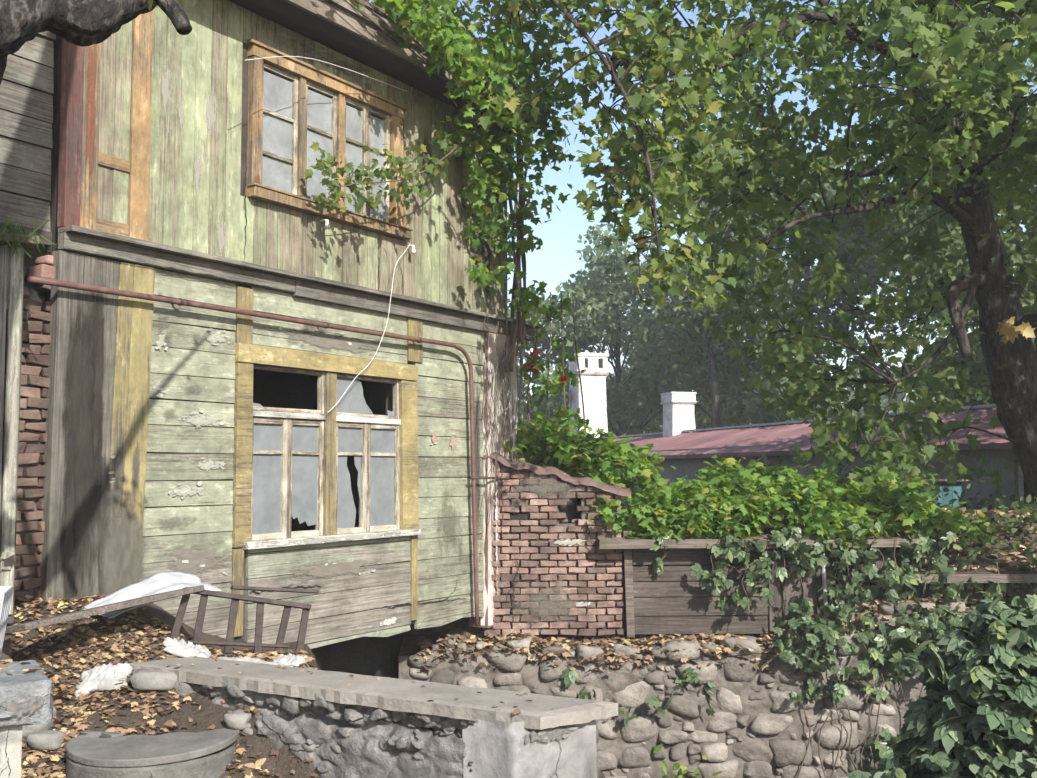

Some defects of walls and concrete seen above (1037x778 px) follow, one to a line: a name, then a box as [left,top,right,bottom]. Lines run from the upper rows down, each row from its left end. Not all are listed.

water stain [61,293,144,599]
crack [0,706,11,776]